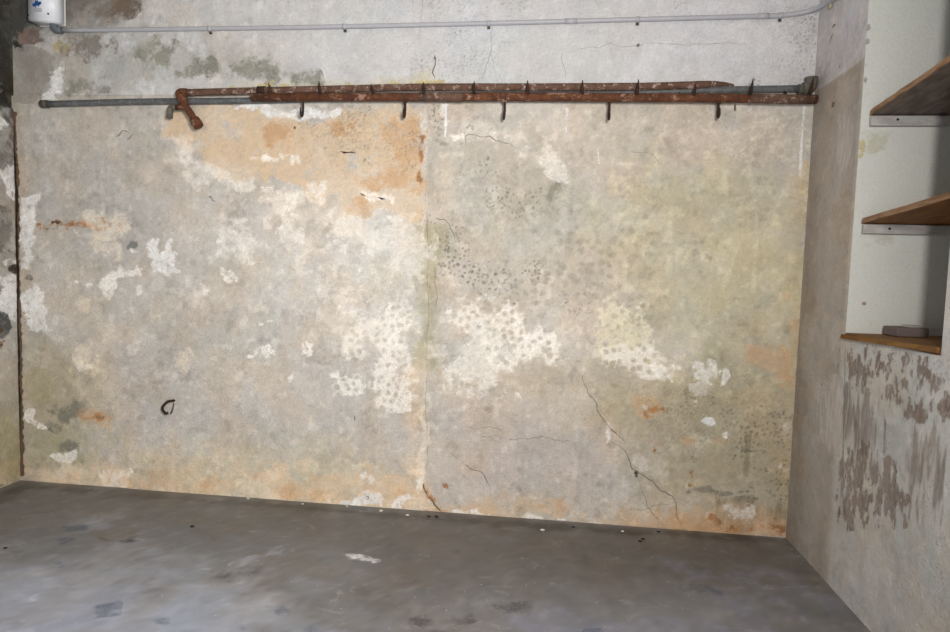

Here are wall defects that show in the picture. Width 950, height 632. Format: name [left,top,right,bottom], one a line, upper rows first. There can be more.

peeling [0,160,15,200]
water stain [164,104,425,221]
rust [37,217,119,231]
peeling [0,274,17,320]
water stain [449,299,560,371]
efflorescence [596,300,681,379]
efflorescence [693,360,730,385]
crack [582,378,679,526]